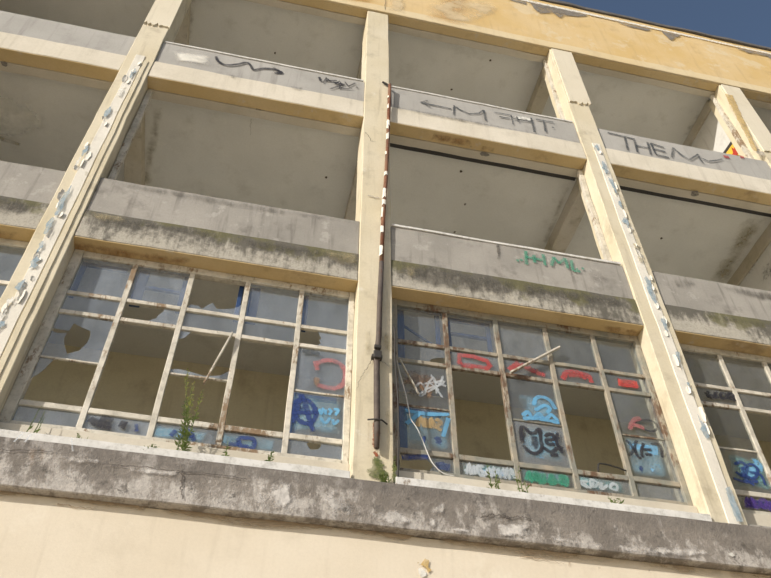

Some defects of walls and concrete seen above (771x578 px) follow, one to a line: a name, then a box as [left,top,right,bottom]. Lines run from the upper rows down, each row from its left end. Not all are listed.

peeling [73,142,91,171]
peeling [594,145,633,233]
peeling [0,186,71,328]
peeling [645,275,668,336]
peeling [698,407,710,438]
crack [103,464,246,499]
leakage [168,509,226,520]
leakage [271,484,291,507]
leakage [236,517,331,529]
leakage [348,512,414,539]
leakage [498,524,525,536]
peeling [726,487,743,522]